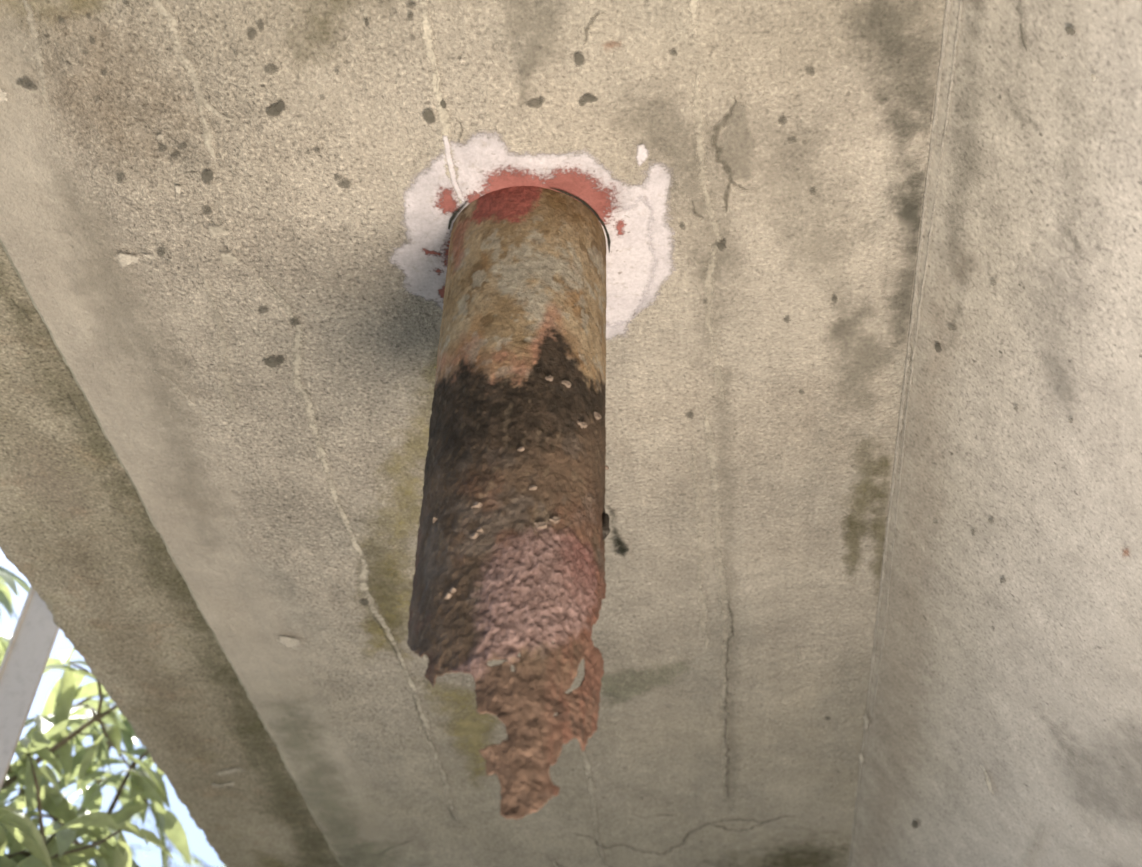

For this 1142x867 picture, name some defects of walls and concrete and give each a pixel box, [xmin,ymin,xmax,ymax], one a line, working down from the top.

crack [692,101,746,217]
rust [534,517,560,529]